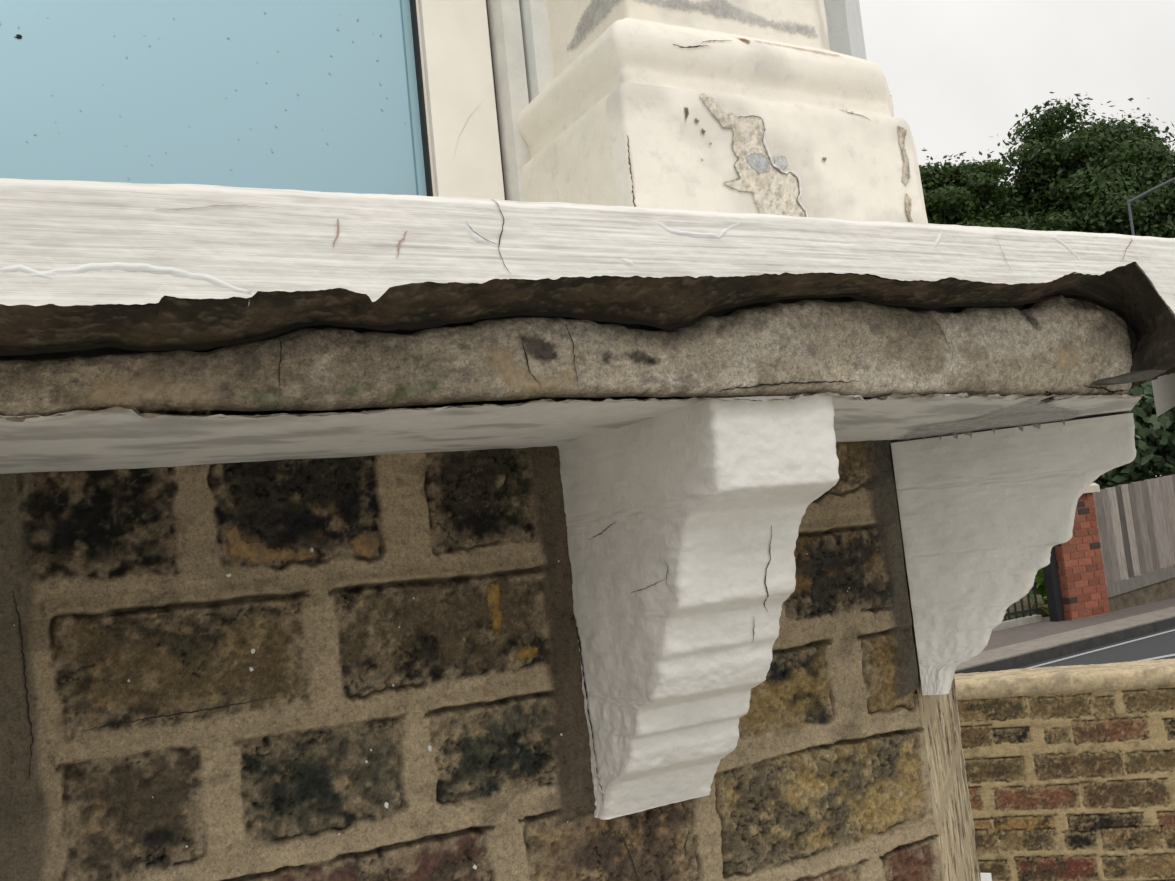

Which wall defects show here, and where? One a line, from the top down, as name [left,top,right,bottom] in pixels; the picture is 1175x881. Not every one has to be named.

crack [157,203,275,211]
crack [467,199,509,271]
peeling [700,94,808,217]
peeling [898,126,913,222]
crack [0,291,1129,395]
spalling [0,262,1175,391]
crack [1040,385,1129,404]
crack [751,526,772,644]